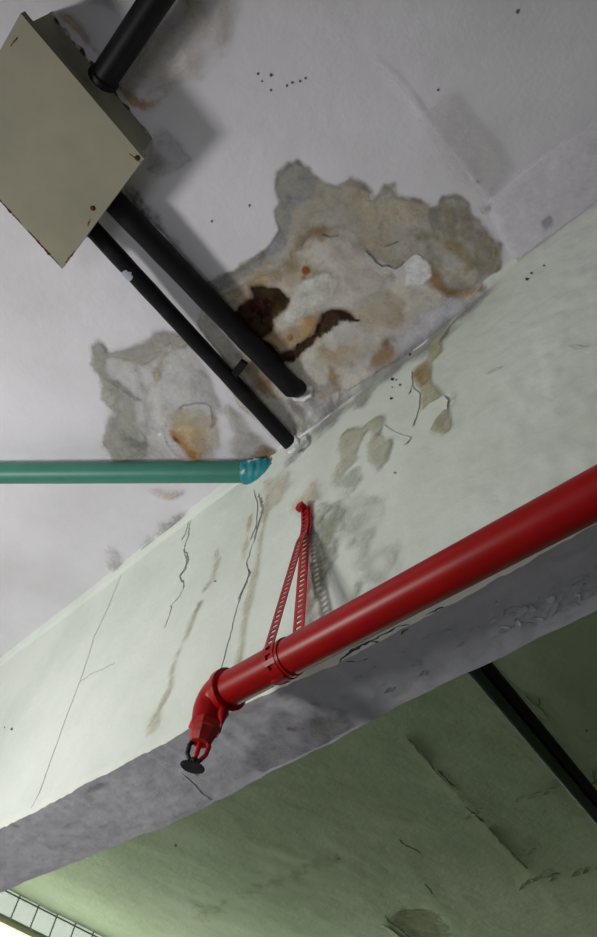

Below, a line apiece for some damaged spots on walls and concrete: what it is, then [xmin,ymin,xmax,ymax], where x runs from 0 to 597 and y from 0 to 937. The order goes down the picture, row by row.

spalling [236,286,359,363]
water stain [198,164,500,462]
peeling [363,251,423,287]
corrosion [171,419,202,461]
water stain [333,417,391,487]
peeling [382,372,448,445]
crack [164,521,190,628]
crack [221,490,264,668]
water stain [293,484,370,626]
crack [31,581,119,808]